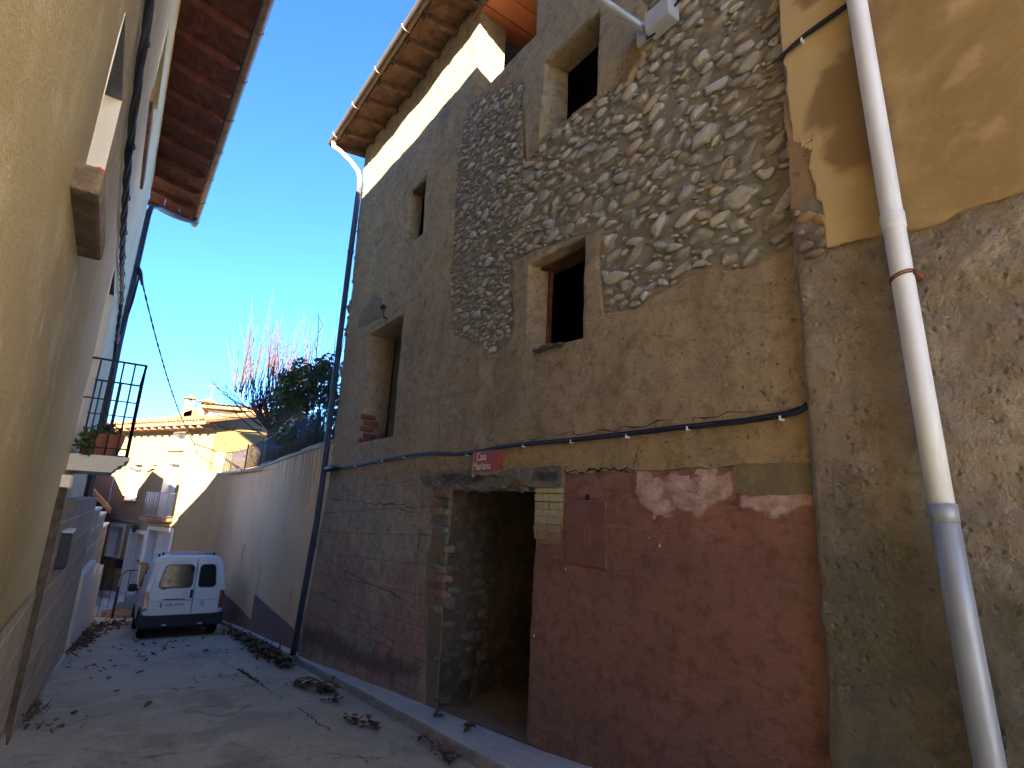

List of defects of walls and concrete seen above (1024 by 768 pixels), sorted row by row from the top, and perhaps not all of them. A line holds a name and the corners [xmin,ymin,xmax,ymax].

spalling [784,96,835,265]
damp [792,12,875,186]
damp [868,0,1019,170]
peeling [632,464,816,522]